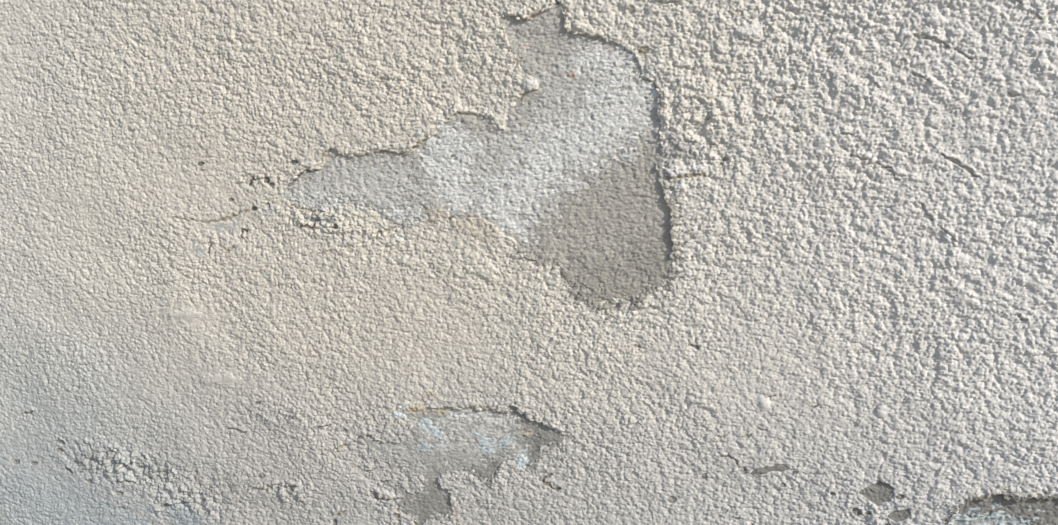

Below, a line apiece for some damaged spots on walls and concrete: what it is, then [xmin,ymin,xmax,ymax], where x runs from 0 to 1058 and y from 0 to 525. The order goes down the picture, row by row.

spalling [251,3,707,319]
spalling [369,395,569,525]
spalling [852,481,921,525]
spalling [931,483,1058,525]